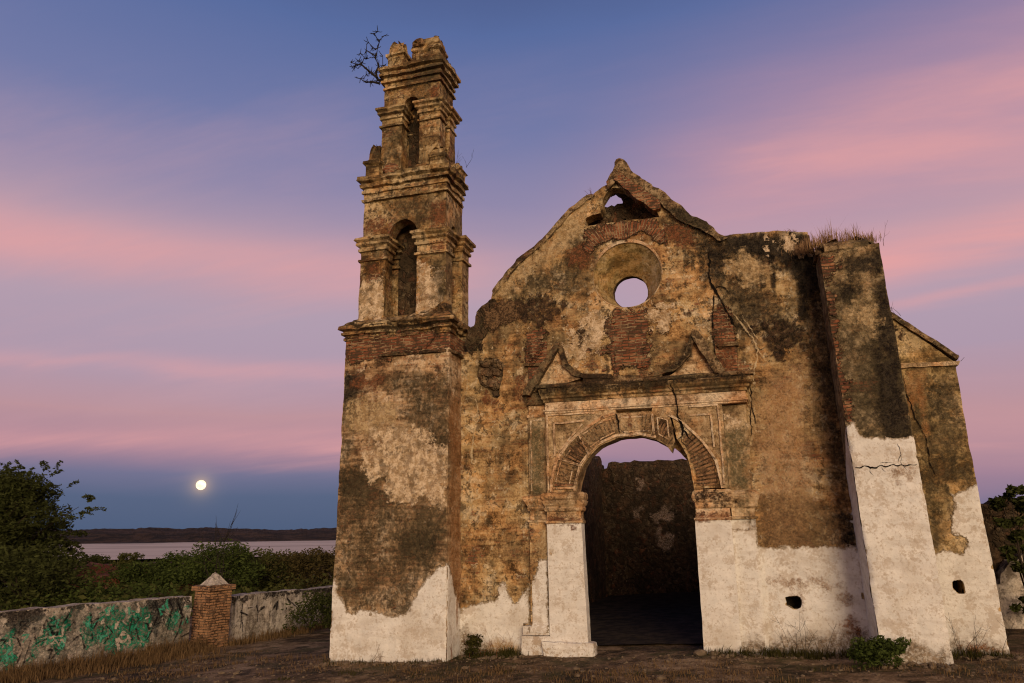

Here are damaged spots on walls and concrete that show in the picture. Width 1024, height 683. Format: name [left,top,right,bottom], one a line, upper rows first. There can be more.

damp [231,371,448,611]
spalling [344,239,446,369]
spalling [465,198,697,408]
crack [668,384,694,445]
spalling [707,303,812,371]
damp [660,208,974,547]
peeling [718,231,1010,665]
crack [855,357,936,476]